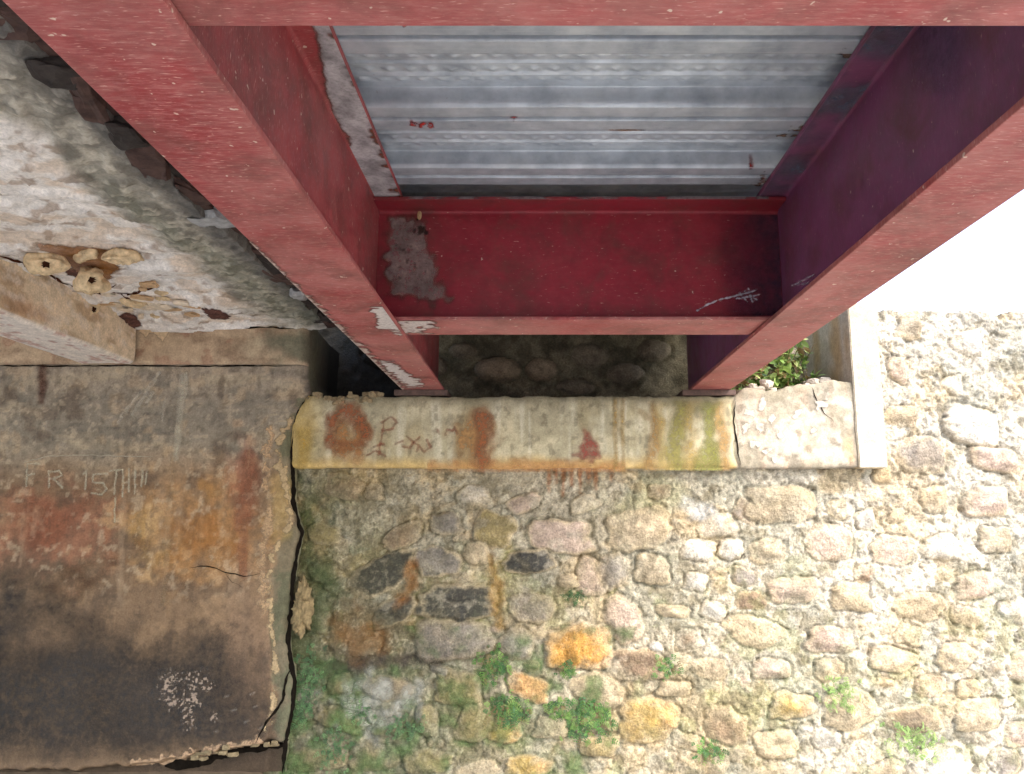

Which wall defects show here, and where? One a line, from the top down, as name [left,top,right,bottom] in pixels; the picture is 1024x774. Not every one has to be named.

spalling [0,0,442,390]
peeling [382,216,453,308]
rust [324,403,372,462]
rust [457,409,494,470]
crack [192,566,260,586]
flaking render [257,417,294,674]
leakage [157,671,216,731]
flaking render [129,692,282,771]